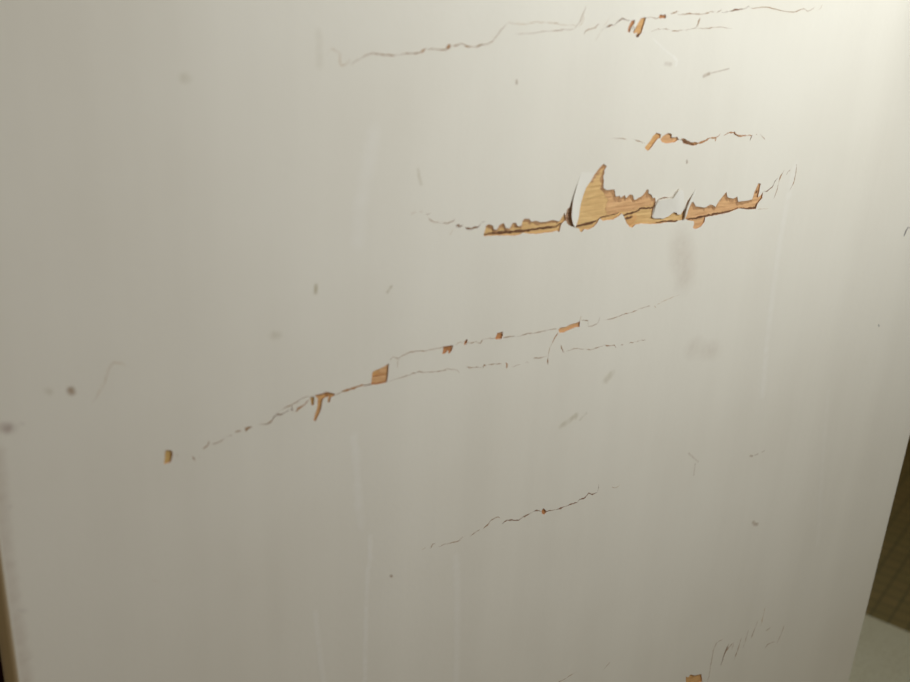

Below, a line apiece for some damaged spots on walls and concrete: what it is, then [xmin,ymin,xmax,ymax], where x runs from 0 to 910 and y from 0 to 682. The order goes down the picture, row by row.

crack [330,6,822,66]
peeling [427,164,797,236]
crack [431,486,617,547]